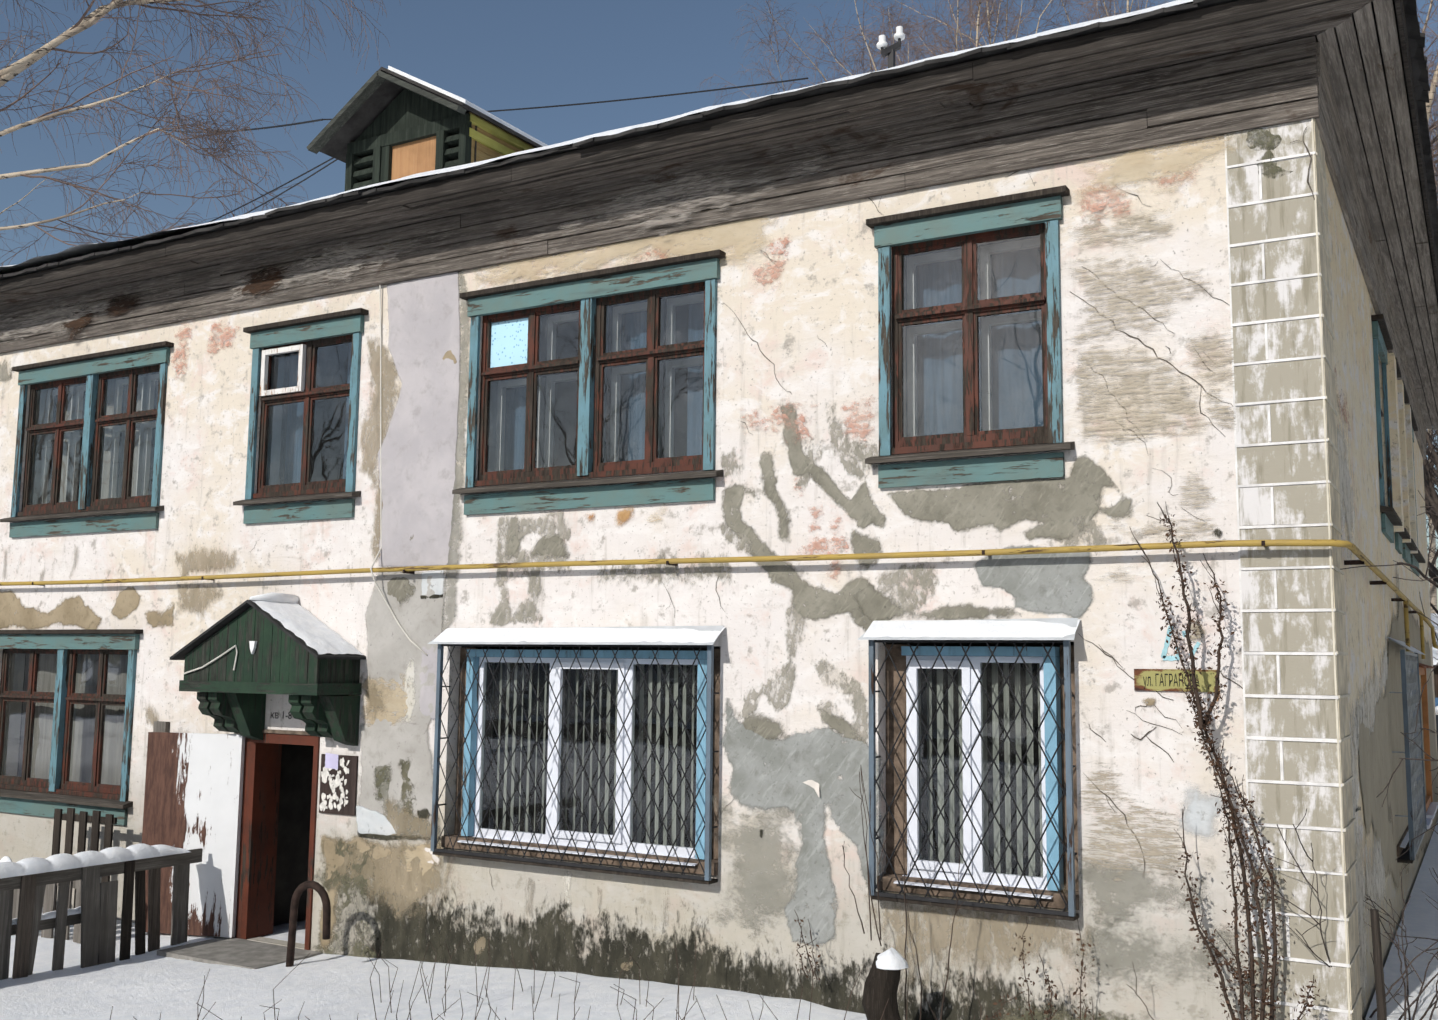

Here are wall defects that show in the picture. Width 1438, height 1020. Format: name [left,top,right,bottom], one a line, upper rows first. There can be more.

peeling [1071,182,1235,443]
peeling [803,507,848,578]
spalling [0,549,235,630]
peeling [803,780,820,797]
leakage [315,760,1229,1020]